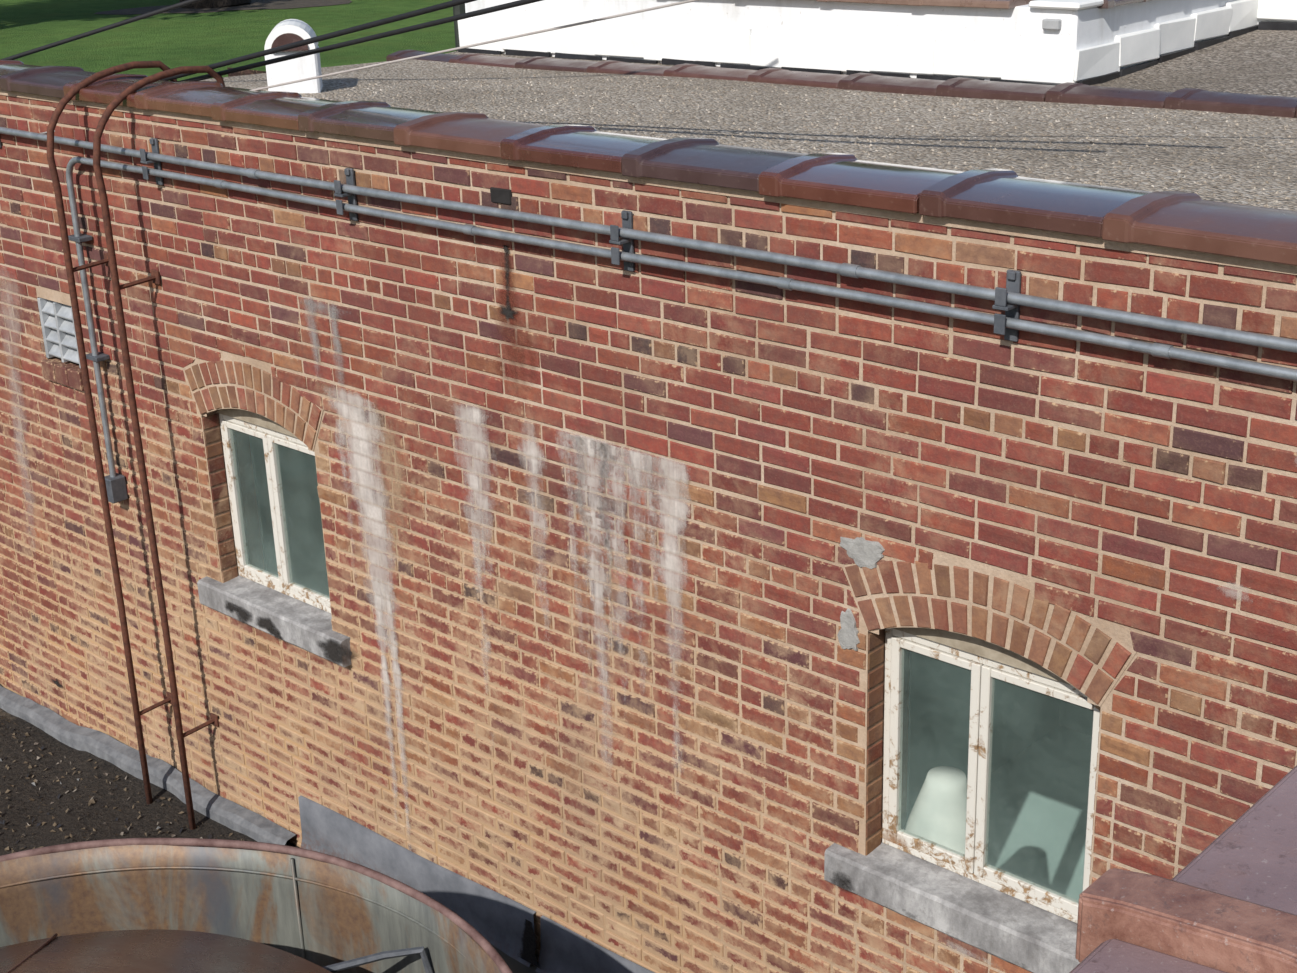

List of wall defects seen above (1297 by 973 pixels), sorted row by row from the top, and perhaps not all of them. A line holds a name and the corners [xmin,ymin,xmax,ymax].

leakage [334,391,404,766]
leakage [459,407,488,523]
leakage [523,441,542,496]
leakage [568,435,688,618]